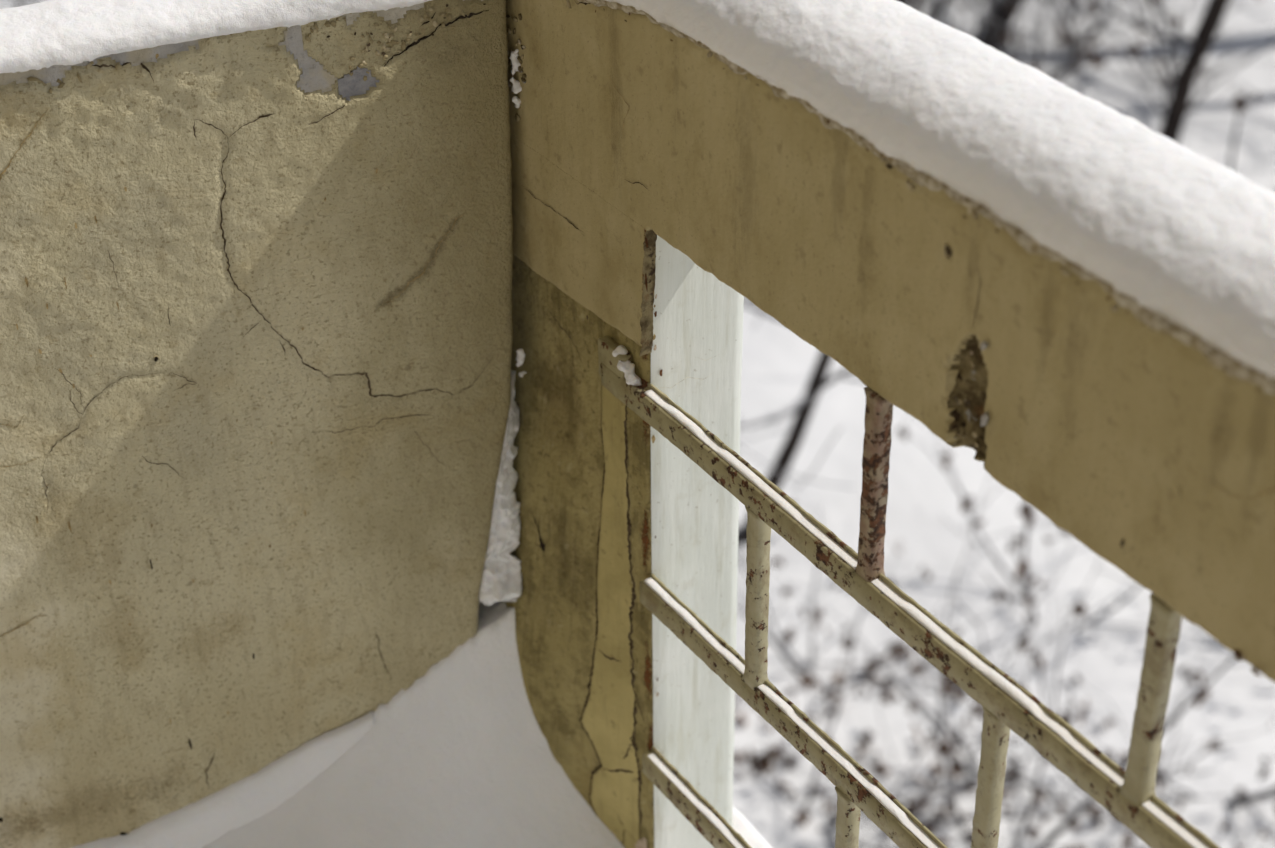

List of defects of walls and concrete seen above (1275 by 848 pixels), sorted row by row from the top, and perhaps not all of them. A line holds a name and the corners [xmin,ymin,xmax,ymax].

crack [93,62,154,82]
peeling [278,0,469,101]
crack [384,10,489,67]
peeling [506,0,526,94]
spalling [566,0,1275,394]
crack [193,113,492,464]
crack [5,367,198,510]
crack [579,406,644,846]